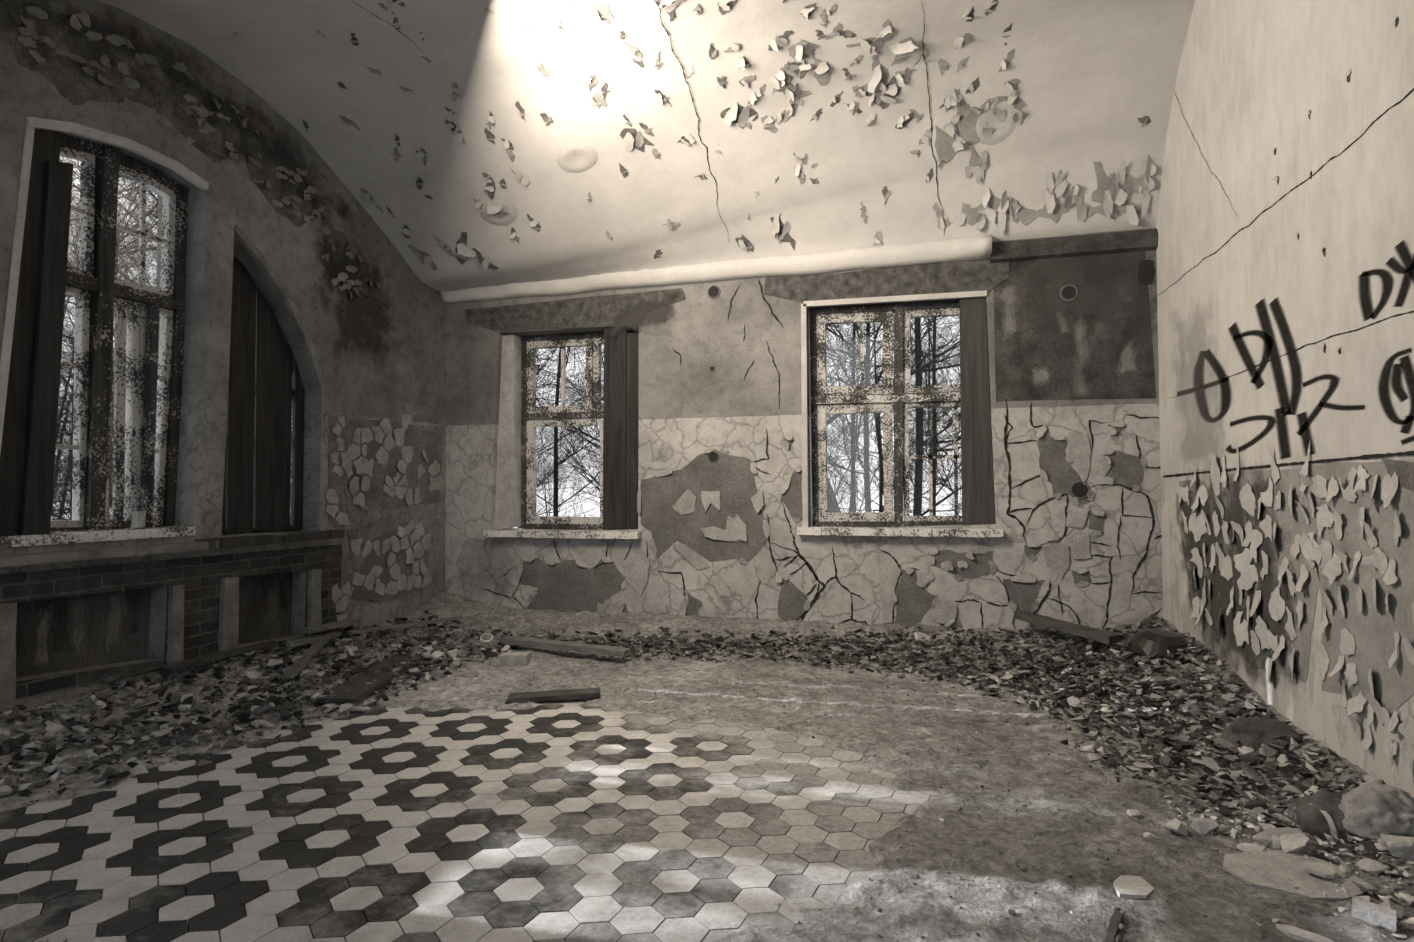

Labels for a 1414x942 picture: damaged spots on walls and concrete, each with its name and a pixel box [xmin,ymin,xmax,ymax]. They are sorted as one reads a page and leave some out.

water stain [0,0,350,219]
peeling [14,1,381,300]
water stain [319,241,390,353]
peeling [619,115,661,178]
crack [654,0,729,243]
peeling [709,0,1156,235]
crack [1158,88,1414,295]
flaking render [0,414,443,698]
crack [482,568,525,609]
crack [595,541,685,596]
crack [728,280,918,624]
peeling [1178,442,1414,786]